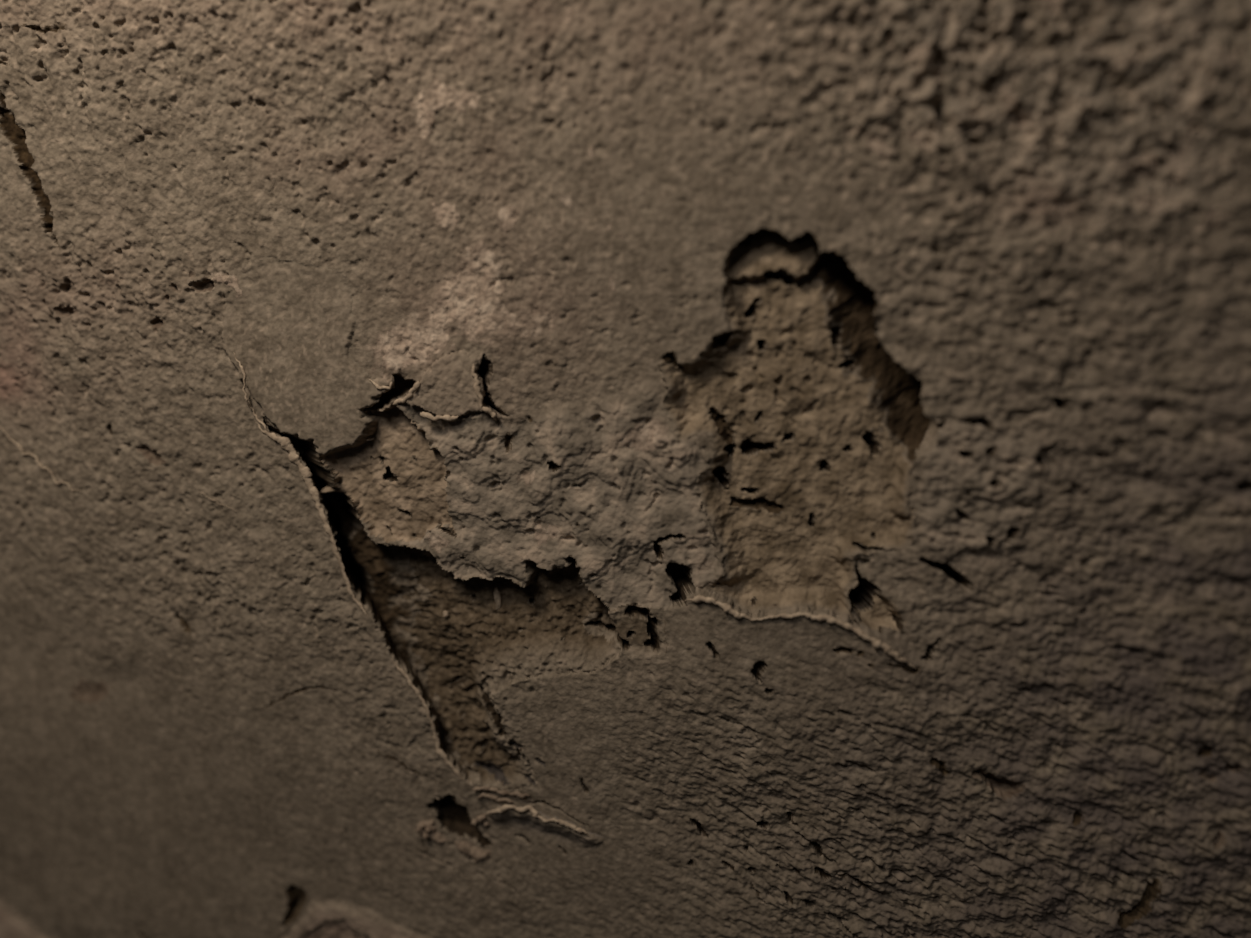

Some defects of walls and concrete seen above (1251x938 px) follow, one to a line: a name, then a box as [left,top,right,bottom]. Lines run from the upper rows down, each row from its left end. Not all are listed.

crack [0,60,60,250]
peeling [221,256,510,543]
spalling [504,432,515,453]
spalling [659,228,1051,634]
spalling [654,533,686,560]
spalling [583,596,669,658]
spalling [751,661,775,695]
spalling [856,638,942,675]
spalling [446,670,545,787]
peeling [471,804,608,854]